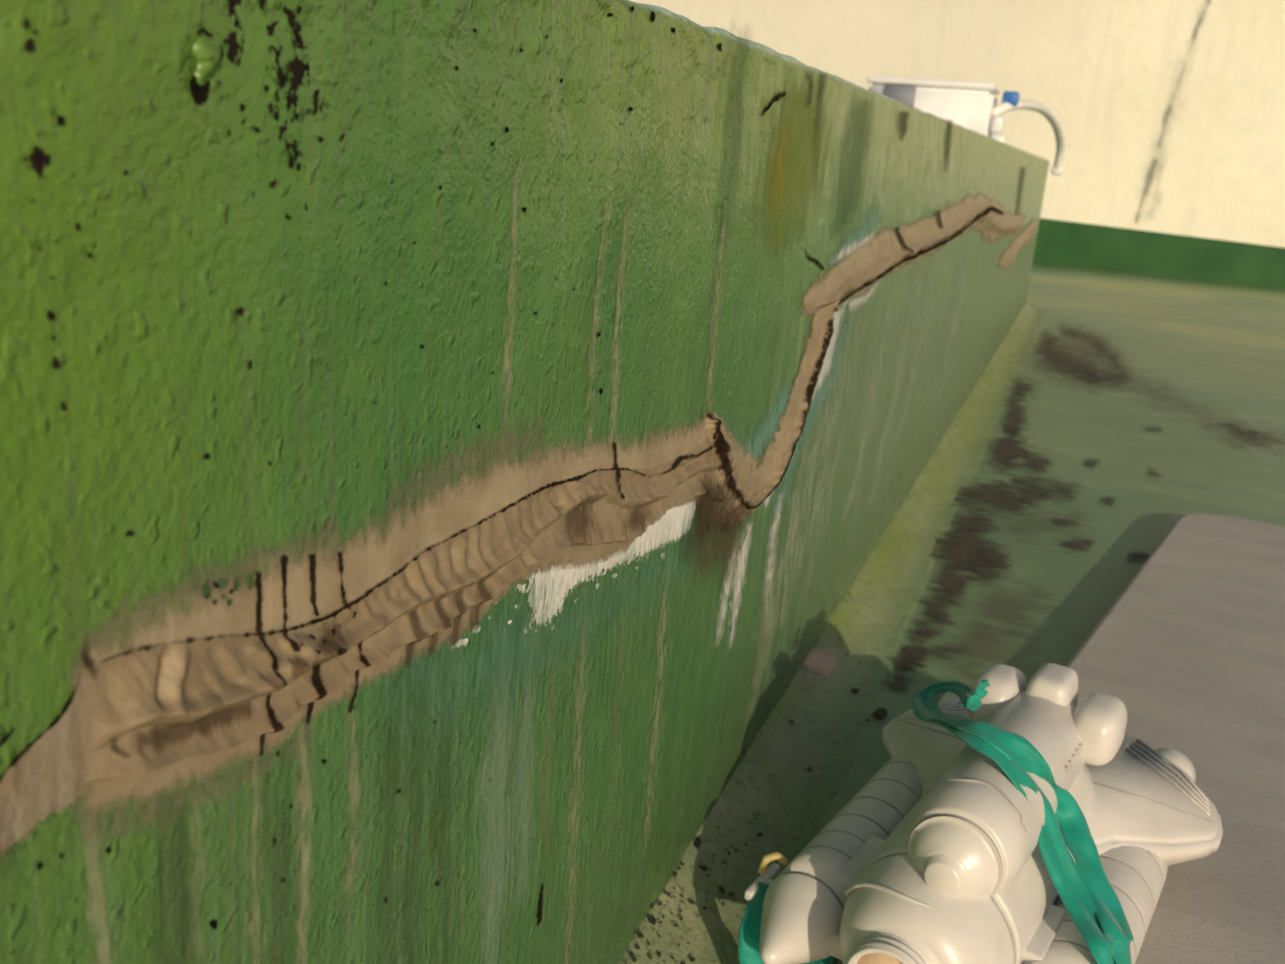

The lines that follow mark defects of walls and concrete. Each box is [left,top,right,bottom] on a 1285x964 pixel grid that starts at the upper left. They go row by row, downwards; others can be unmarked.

peeling [831,207,882,266]
peeling [763,282,879,512]
damp [1036,321,1132,393]
peeling [412,499,696,724]
crack [74,192,1038,832]
damp [717,524,752,647]
damp [745,490,785,753]
flaking render [804,651,836,681]
damp [882,375,1078,690]
damp [1052,518,1096,550]
flaking render [0,670,87,859]